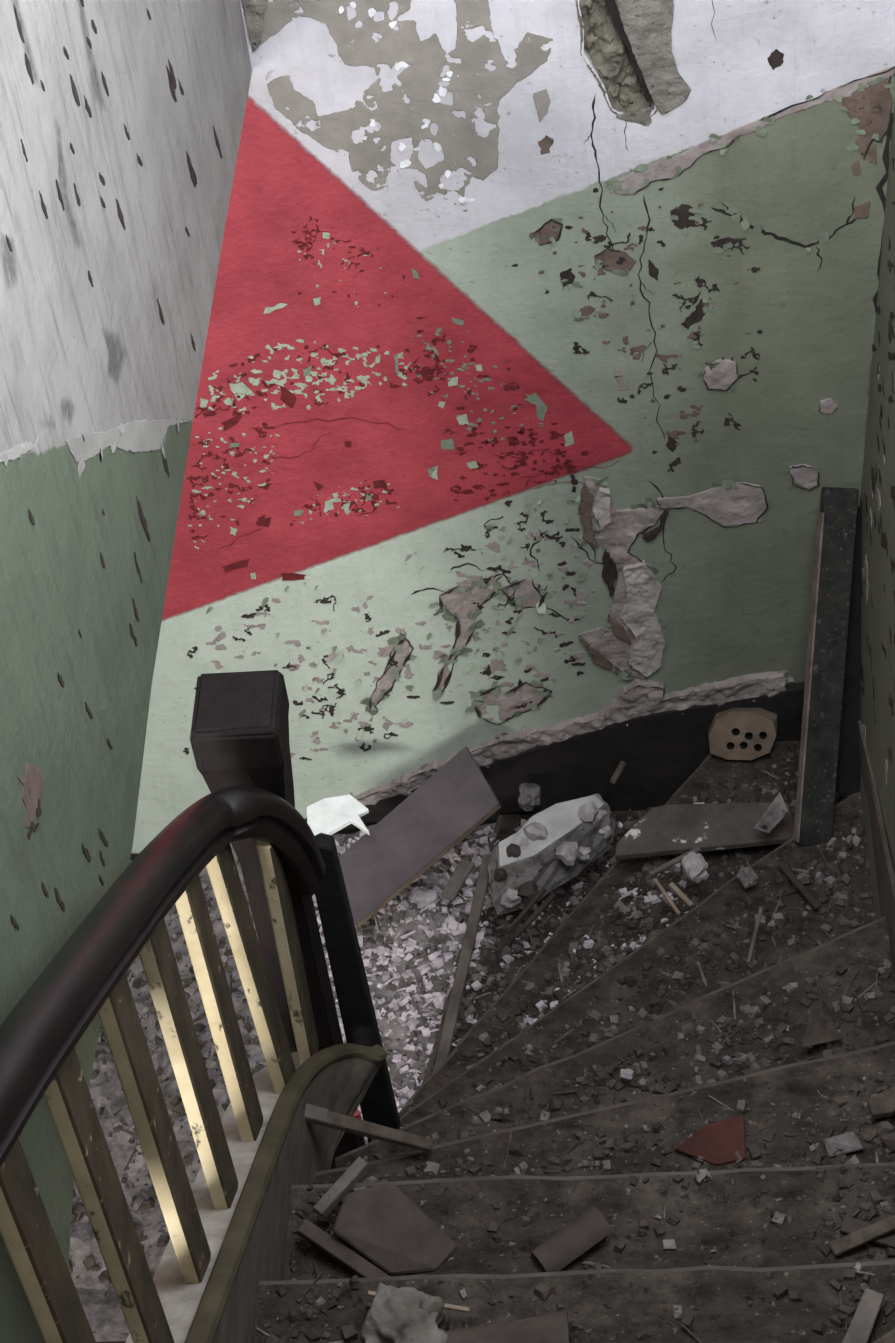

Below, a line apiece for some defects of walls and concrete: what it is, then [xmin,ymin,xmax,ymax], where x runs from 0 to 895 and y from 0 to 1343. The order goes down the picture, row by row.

peeling [14,4,45,91]
peeling [64,46,92,118]
peeling [166,59,184,102]
peeling [264,217,419,314]
peeling [241,0,554,212]
peeling [529,216,666,322]
crack [584,94,665,441]
flaking render [576,0,691,126]
peeling [593,66,895,284]
crack [711,77,894,308]
peeling [573,275,763,472]
flaking render [65,317,794,806]